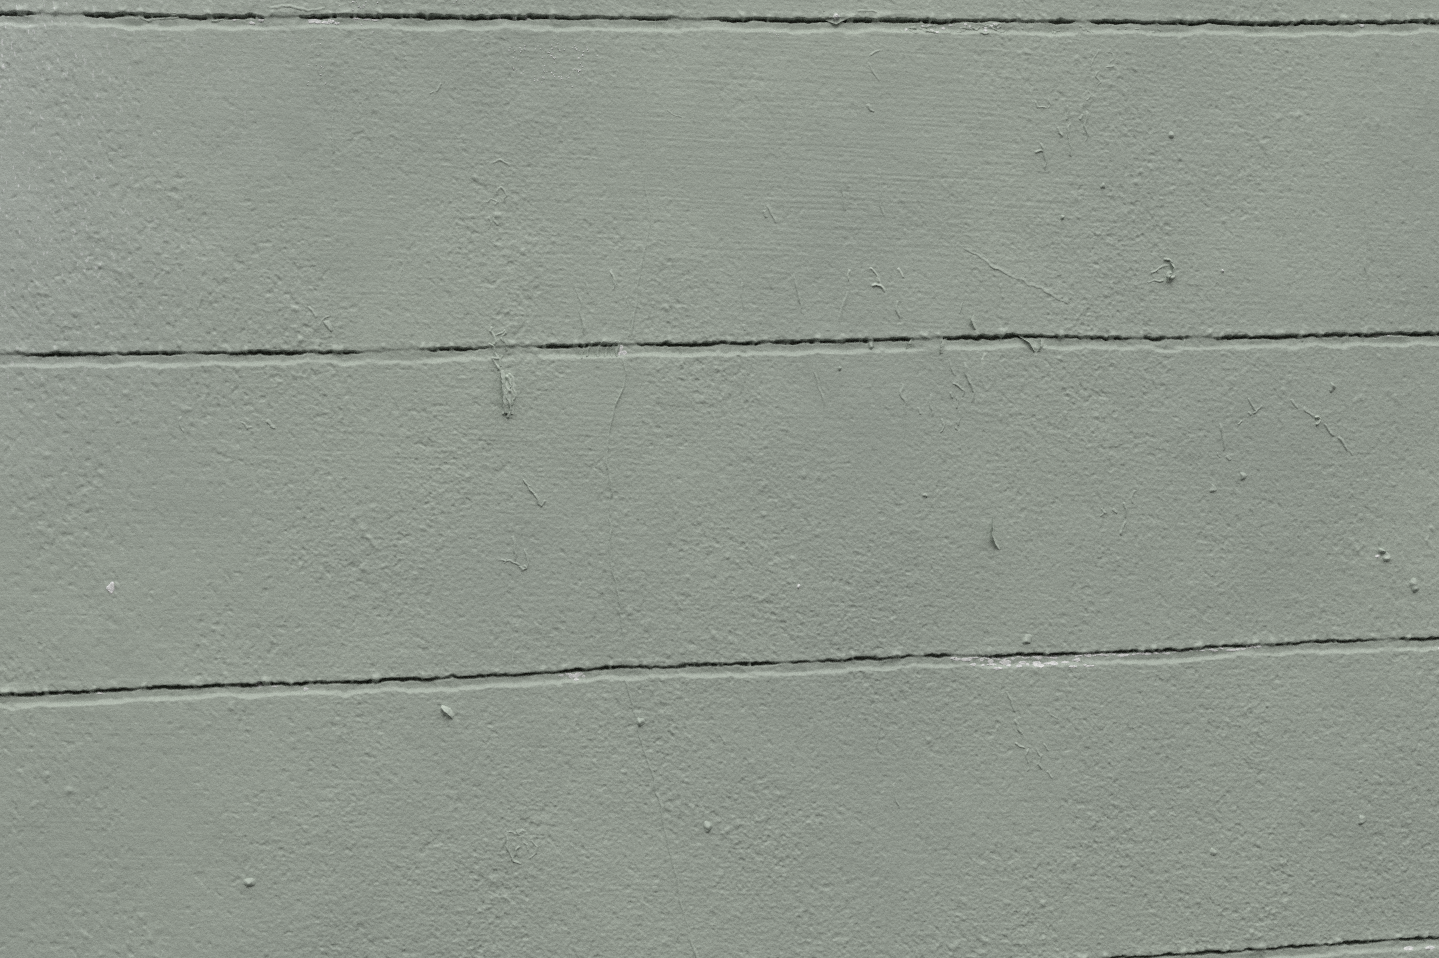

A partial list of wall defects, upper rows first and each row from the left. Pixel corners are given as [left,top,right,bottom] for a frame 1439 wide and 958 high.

spalling [1147,258,1176,283]
peeling [488,327,517,419]